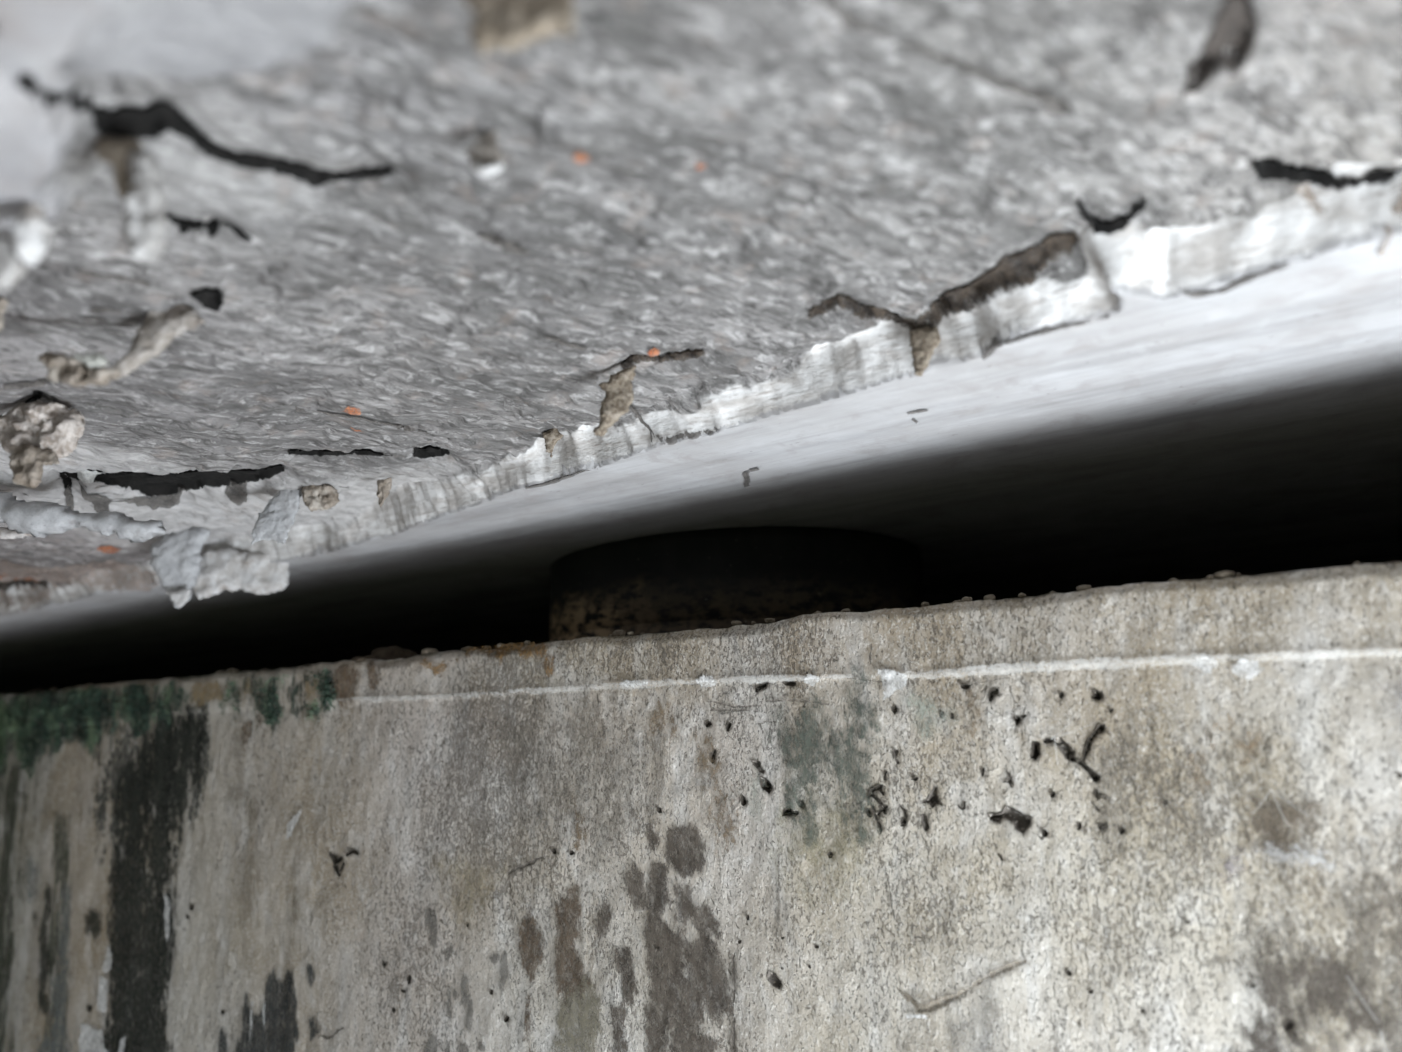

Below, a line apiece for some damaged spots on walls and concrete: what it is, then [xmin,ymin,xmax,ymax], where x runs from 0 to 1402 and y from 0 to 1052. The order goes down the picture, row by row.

crack [1181,0,1258,101]
spalling [0,0,1402,615]
damp [0,696,210,1052]
damp [286,810,302,839]
damp [424,909,452,958]
damp [490,823,733,1052]
damp [218,963,321,1052]
damp [424,974,485,1052]